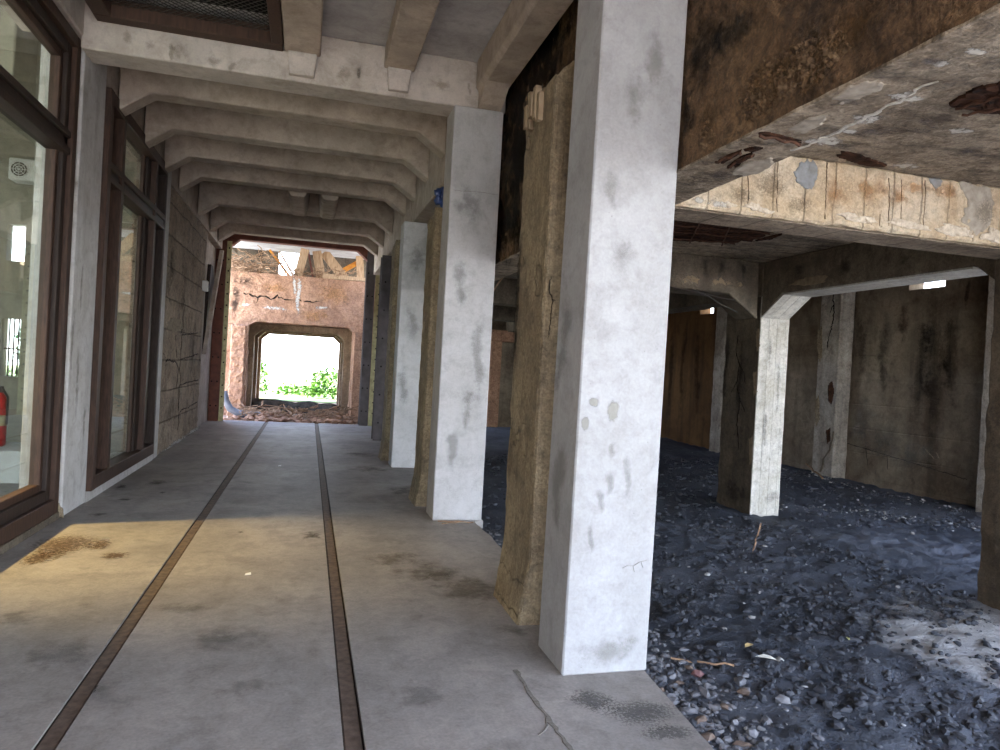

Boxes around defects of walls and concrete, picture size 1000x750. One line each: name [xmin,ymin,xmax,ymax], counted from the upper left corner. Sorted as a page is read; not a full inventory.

peeling [832,79,884,105]
spalling [949,81,1000,117]
peeling [715,113,829,177]
spalling [836,151,887,167]
spalling [721,201,775,214]
peeling [837,181,1000,244]
spalling [673,220,782,246]
crack [243,292,323,303]
crack [827,294,835,348]
crack [513,669,573,750]